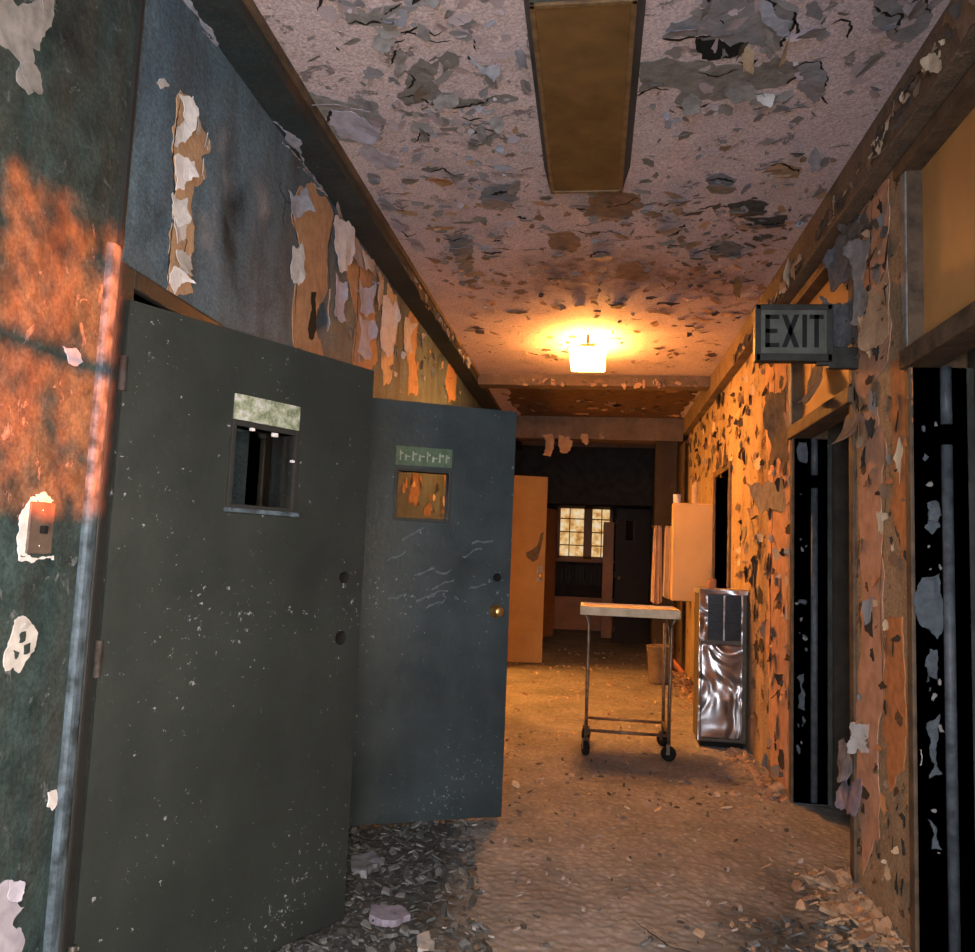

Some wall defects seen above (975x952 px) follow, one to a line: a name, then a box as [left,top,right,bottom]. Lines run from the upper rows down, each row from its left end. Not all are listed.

peeling [0,0,54,95]
peeling [156,78,211,296]
peeling [273,121,471,403]
peeling [309,0,975,896]
peeling [3,616,38,673]
peeling [47,789,58,811]